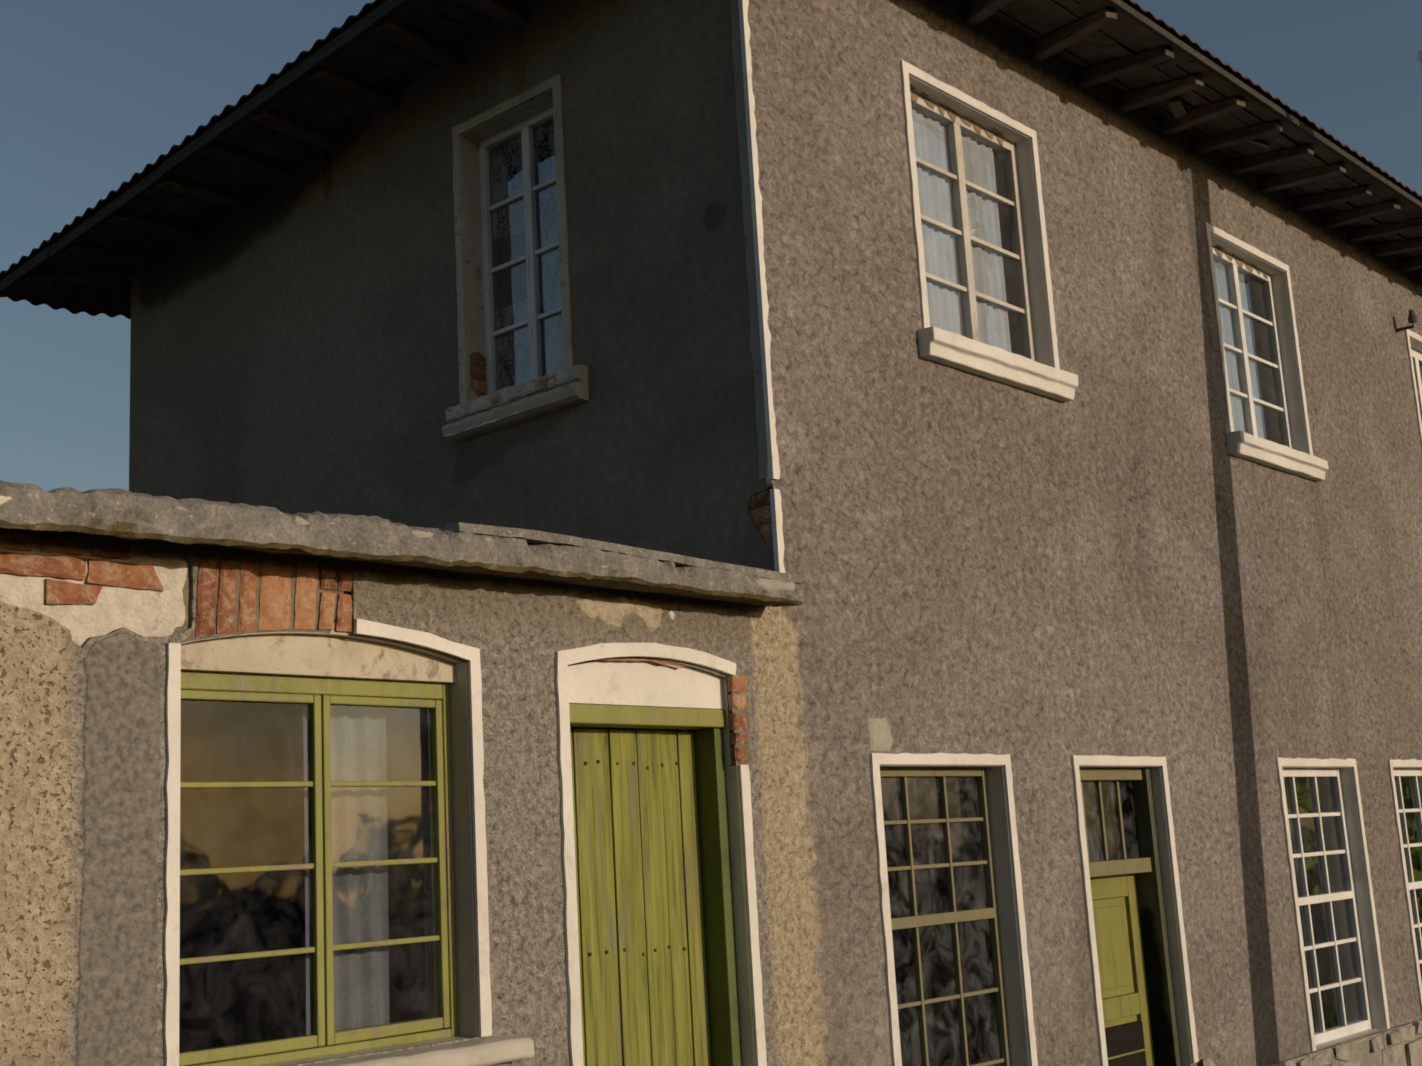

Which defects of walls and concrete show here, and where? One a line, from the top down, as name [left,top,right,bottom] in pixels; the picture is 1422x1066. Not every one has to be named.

flaking render [748,465,774,542]
spalling [0,530,187,647]